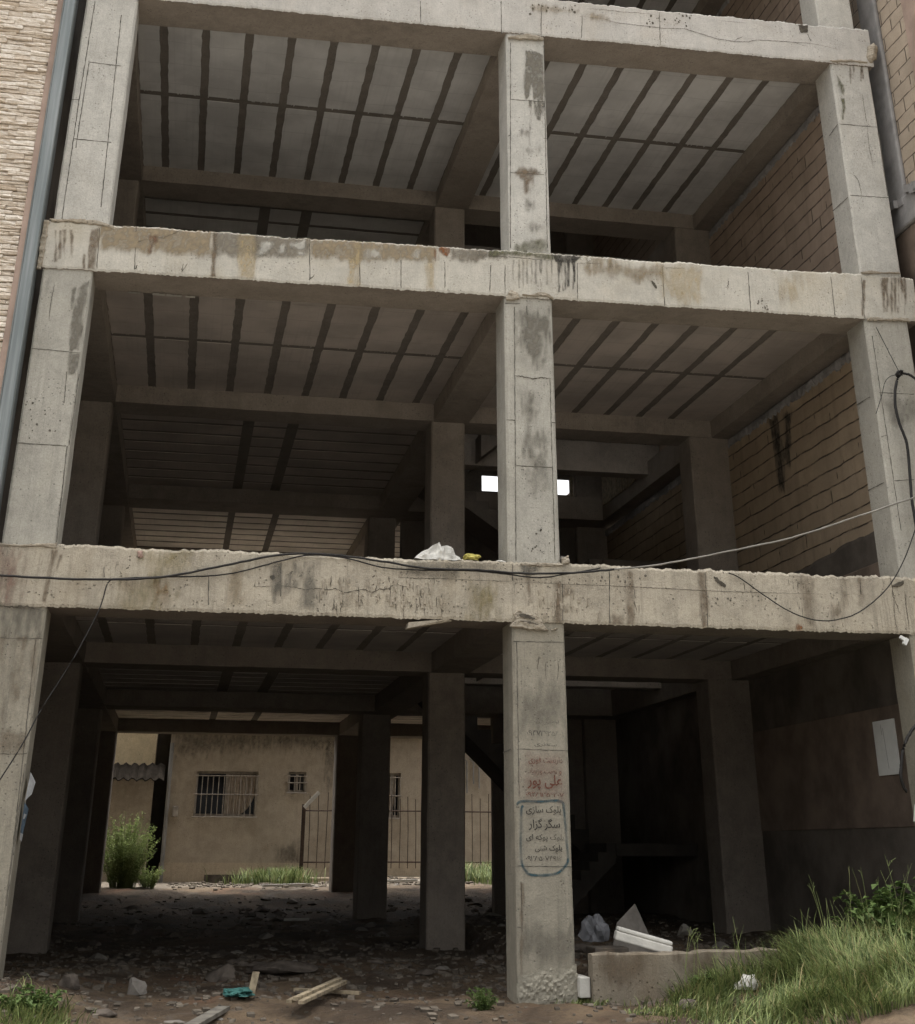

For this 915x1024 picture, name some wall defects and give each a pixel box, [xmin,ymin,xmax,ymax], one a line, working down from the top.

leakage [524,51,544,119]
leakage [83,230,99,268]
leakage [516,240,611,290]
leakage [881,278,906,310]
leakage [69,282,89,374]
leakage [522,313,550,359]
crack [253,576,811,624]
spalling [516,964,578,1005]